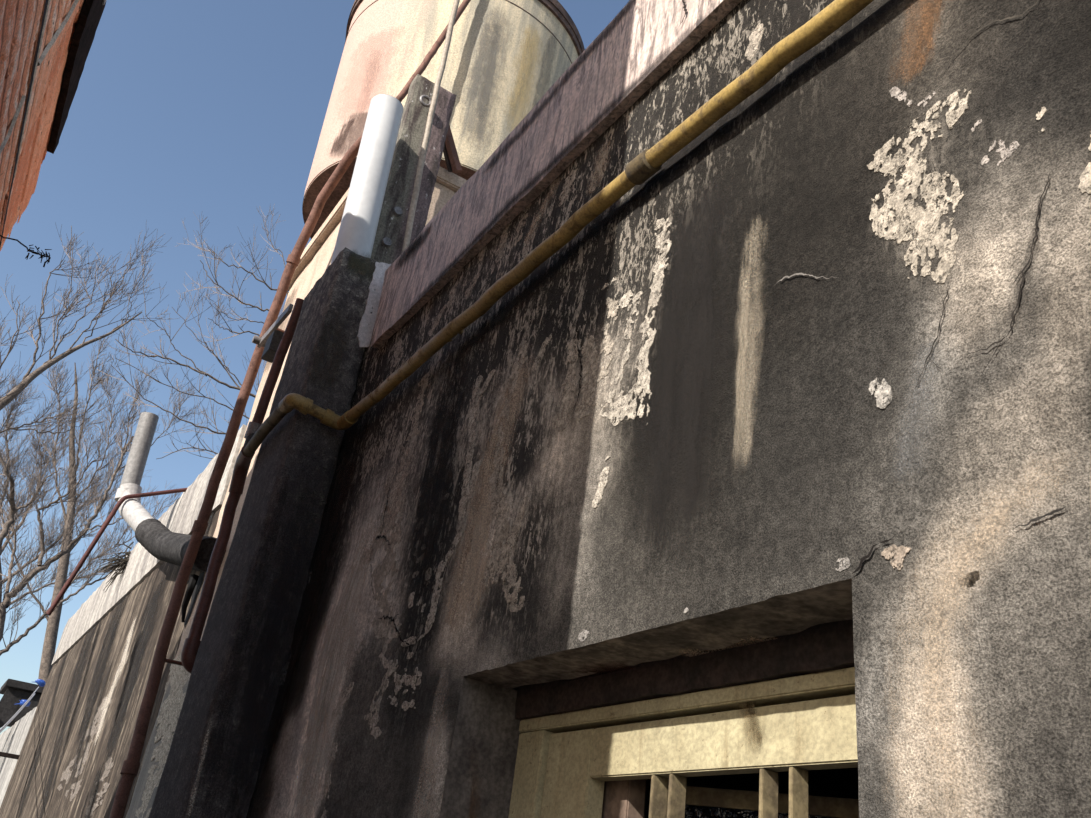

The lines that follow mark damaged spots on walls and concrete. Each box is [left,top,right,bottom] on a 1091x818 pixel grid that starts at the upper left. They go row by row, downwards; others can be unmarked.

water stain [395,224,432,267]
water stain [482,0,635,173]
peeling [551,217,672,432]
water stain [411,15,836,629]
peeling [745,23,765,61]
spalling [869,378,893,409]
peeling [867,86,972,284]
crack [911,171,1051,399]
peeling [981,139,1020,166]
peeling [356,333,552,739]
spalling [881,544,911,570]
water stain [16,581,166,818]